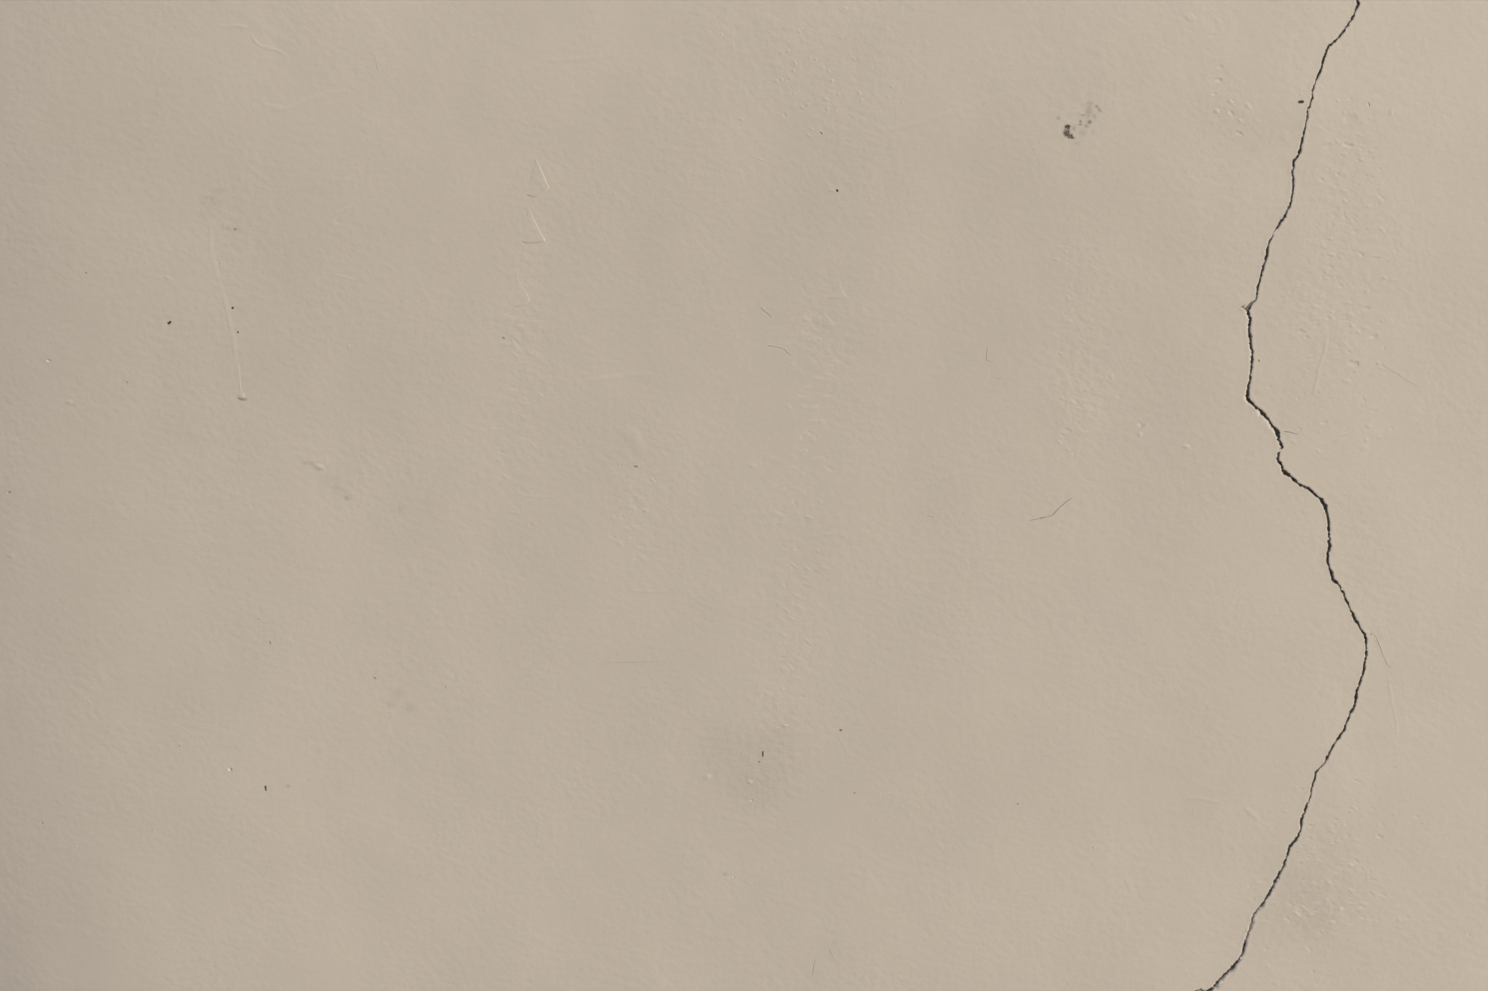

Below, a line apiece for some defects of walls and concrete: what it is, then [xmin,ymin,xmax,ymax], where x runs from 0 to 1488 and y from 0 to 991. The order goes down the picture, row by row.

crack [1191,0,1394,991]